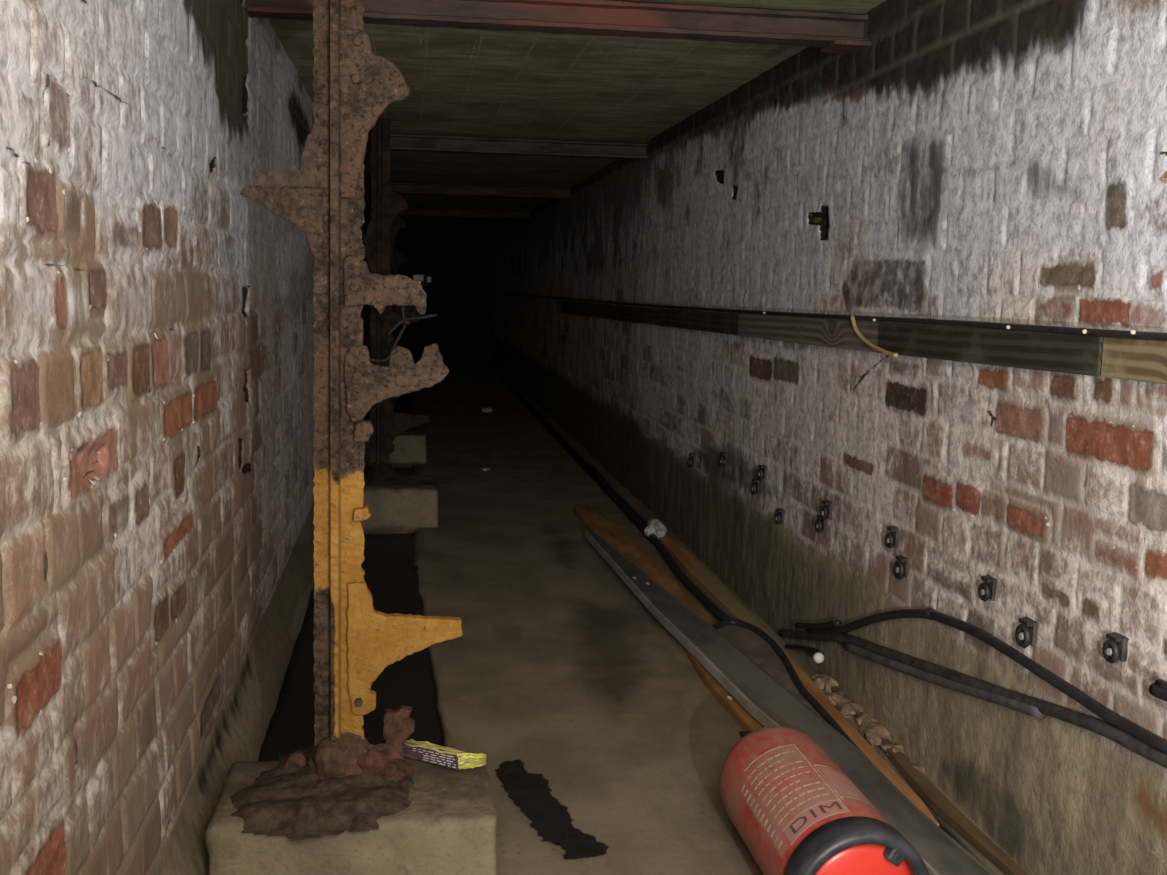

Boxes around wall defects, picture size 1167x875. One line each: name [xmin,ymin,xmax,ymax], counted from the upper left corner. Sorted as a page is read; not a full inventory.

water stain [185,0,249,139]
water stain [651,0,1085,152]
water stain [903,143,943,238]
peeling [979,365,1042,441]
peeling [1051,375,1154,471]
peeling [1129,485,1167,532]
water stain [198,655,251,791]